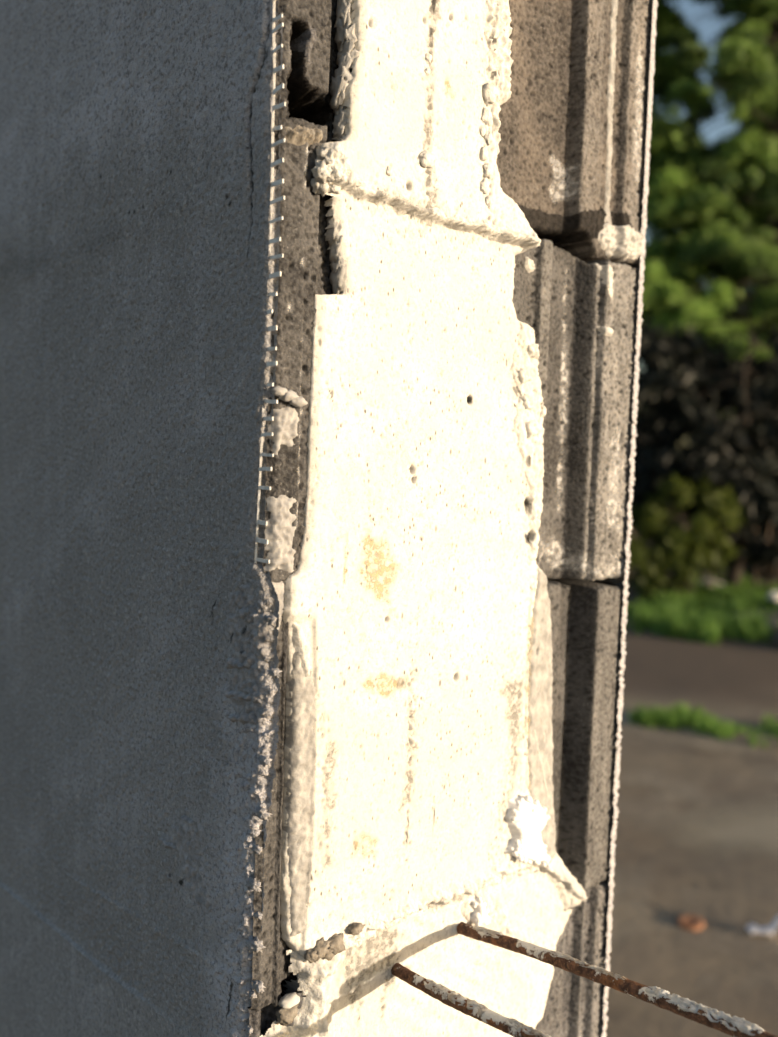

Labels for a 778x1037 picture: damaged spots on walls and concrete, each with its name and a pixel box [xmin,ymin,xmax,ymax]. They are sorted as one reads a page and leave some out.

spalling [286,16,332,132]
spalling [484,0,513,155]
spalling [517,203,632,246]
spalling [508,322,546,560]
spalling [222,584,282,725]
peeling [292,623,311,677]
spalling [402,715,419,806]
flaking render [245,877,262,892]
flaking render [245,937,267,953]
flaking render [249,980,266,999]